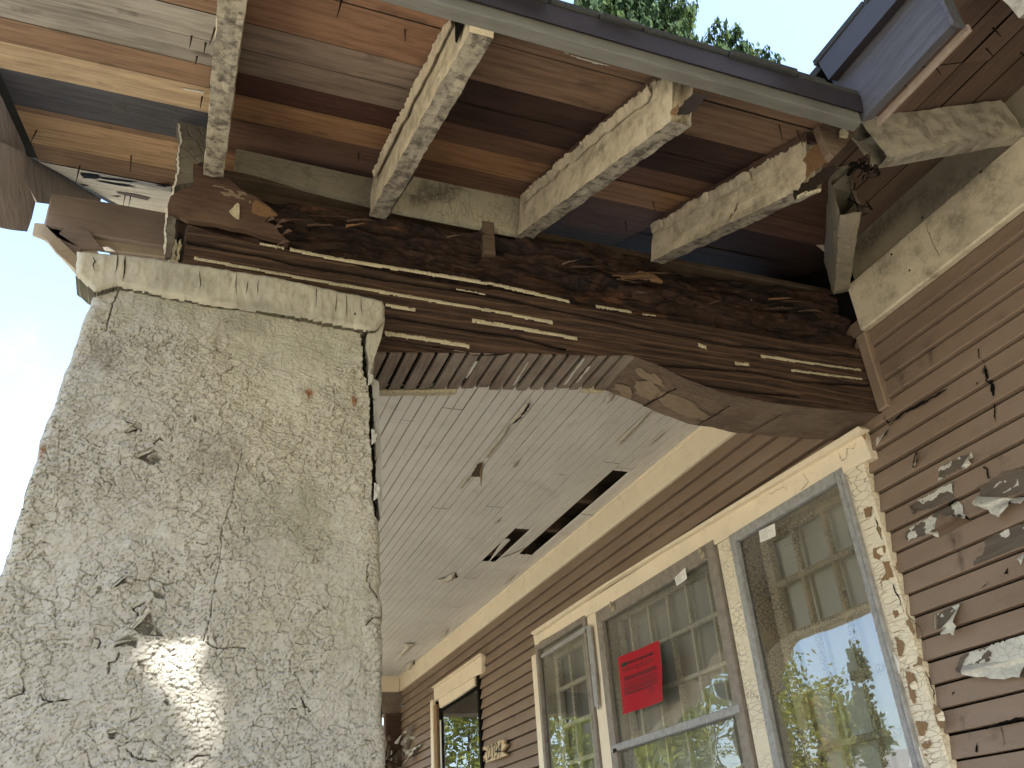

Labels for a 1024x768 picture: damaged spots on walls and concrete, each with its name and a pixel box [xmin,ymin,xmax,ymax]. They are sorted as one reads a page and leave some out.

peeling [229,203,240,220]
crack [92,252,128,331]
crack [361,339,380,518]
peeling [603,368,711,444]
crack [978,349,996,421]
peeling [905,452,1024,540]
peeling [864,506,899,589]
spalling [112,608,162,663]
peeling [892,606,923,704]
peeling [933,603,961,635]
peeling [955,635,1024,679]
peeling [915,704,946,756]